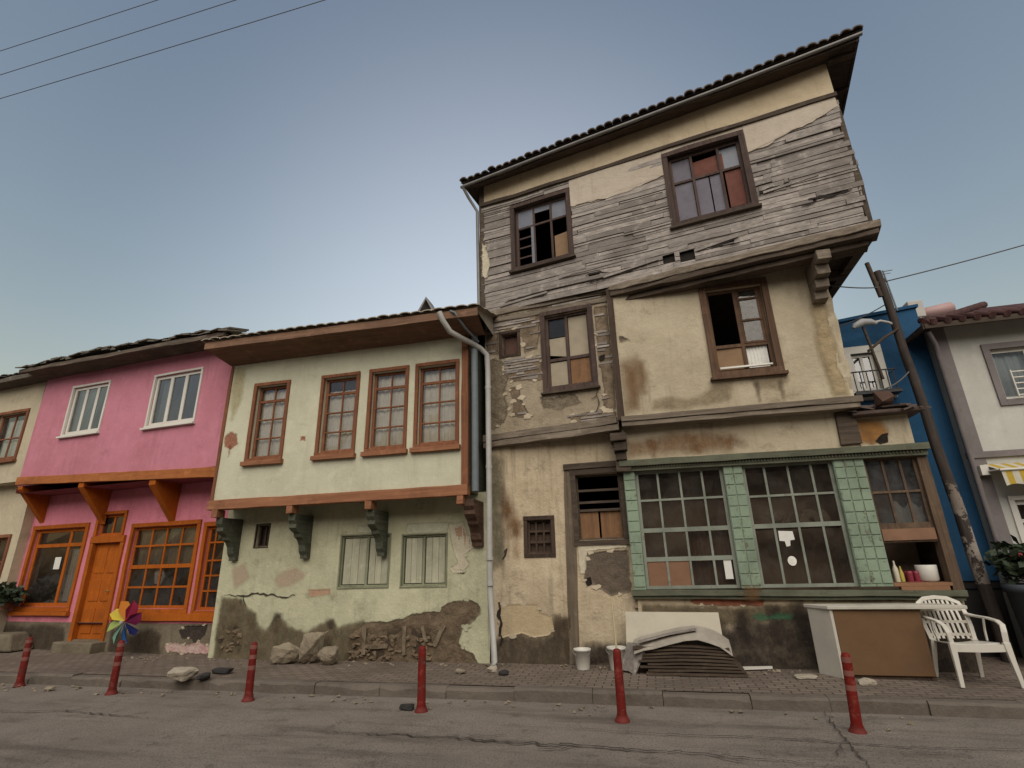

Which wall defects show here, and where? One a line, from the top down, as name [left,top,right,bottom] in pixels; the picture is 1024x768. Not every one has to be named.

peeling [486,296,630,429]
spalling [578,544,632,596]
crack [228,592,294,606]
peeling [165,623,209,655]
peeling [497,601,555,639]